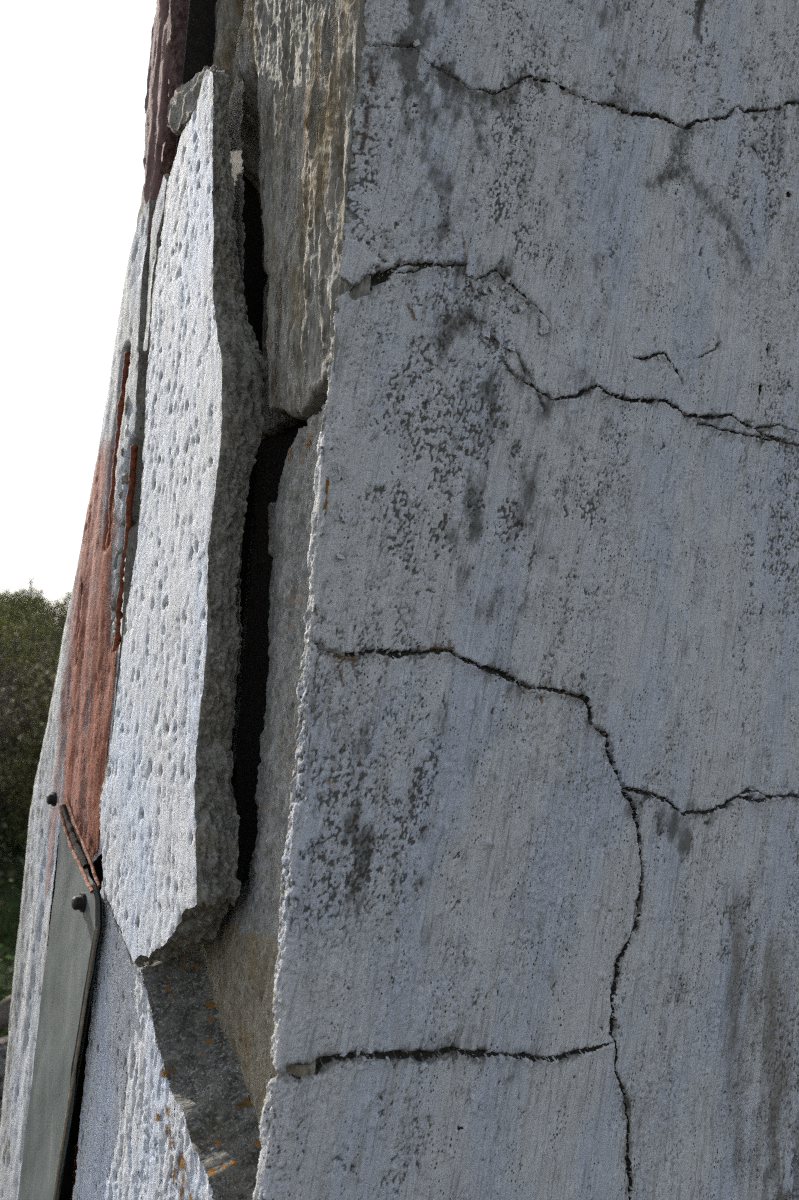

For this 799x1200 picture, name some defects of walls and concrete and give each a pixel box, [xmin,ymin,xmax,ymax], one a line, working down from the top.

crack [368,39,799,130]
crack [353,262,543,314]
crack [465,317,799,447]
corrosion [44,351,138,893]
spalling [80,0,387,1200]
spalling [47,835,59,948]
crack [289,643,799,1200]
spalling [59,997,92,1200]